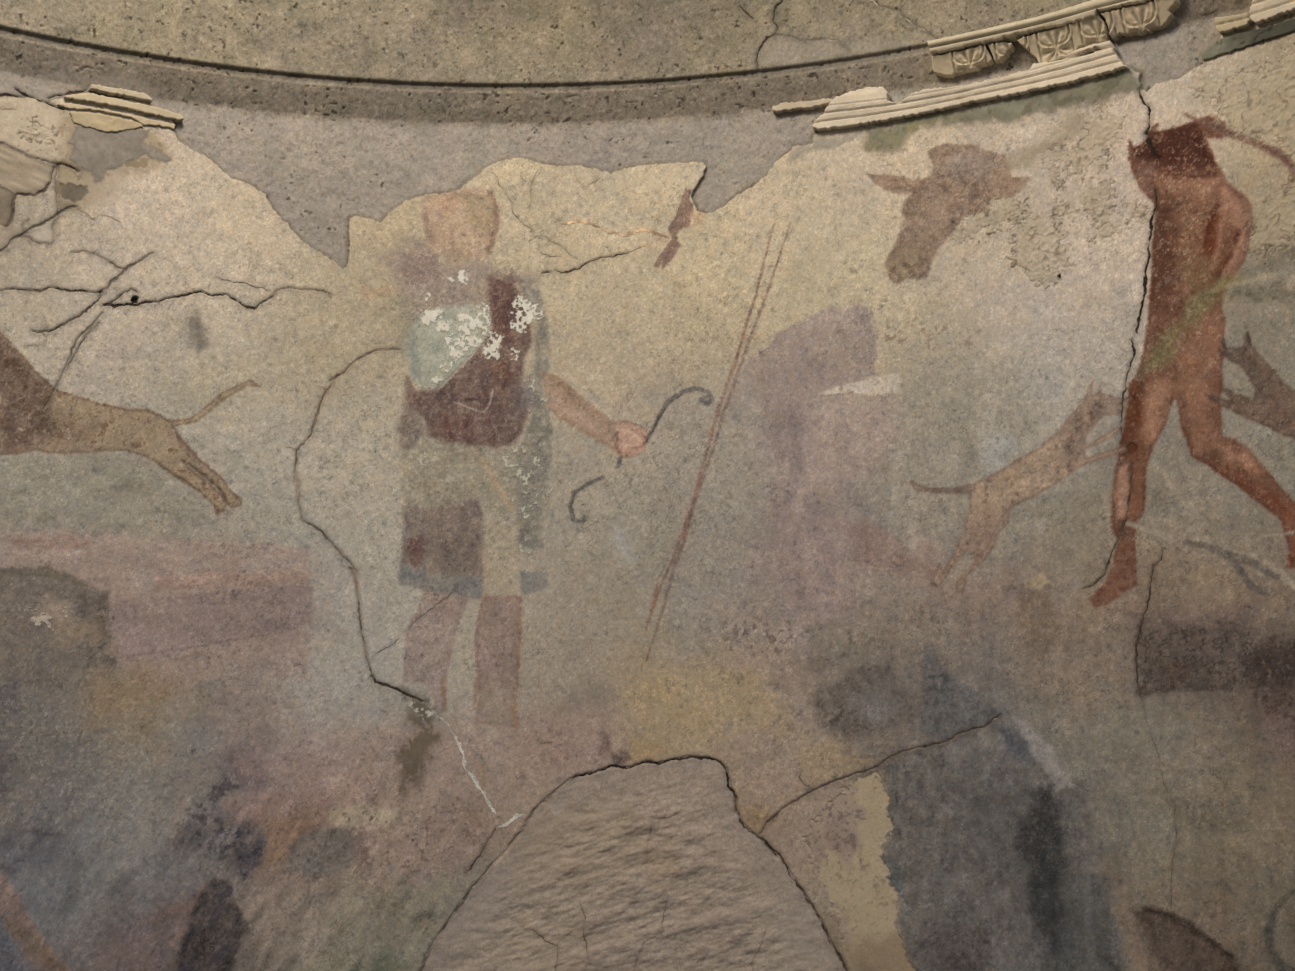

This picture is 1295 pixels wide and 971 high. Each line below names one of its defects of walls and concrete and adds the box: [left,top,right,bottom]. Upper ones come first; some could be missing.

crack [741,0,849,67]
flaking render [18,115,58,150]
crack [0,89,86,110]
crack [1139,90,1159,158]
crack [0,142,329,410]
peeling [448,270,469,285]
peeling [417,292,544,385]
crack [1086,189,1157,588]
peeling [500,446,540,519]
crack [291,349,1000,971]